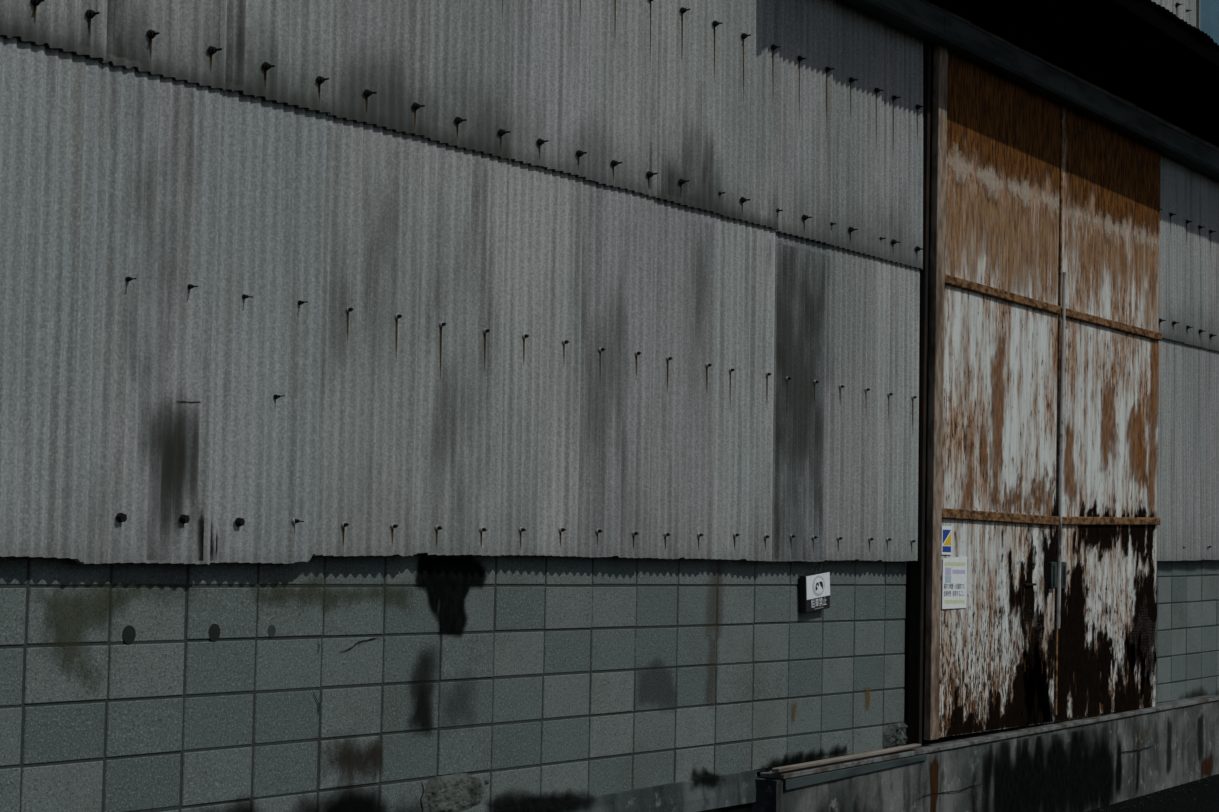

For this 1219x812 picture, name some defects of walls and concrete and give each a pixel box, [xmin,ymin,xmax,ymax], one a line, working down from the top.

rust [947,51,1161,242]
water stain [776,257,821,459]
water stain [160,427,185,502]
water stain [416,553,486,636]
water stain [300,742,387,812]
spalling [422,773,490,812]
rust [931,758,939,812]
water stain [973,730,1122,812]